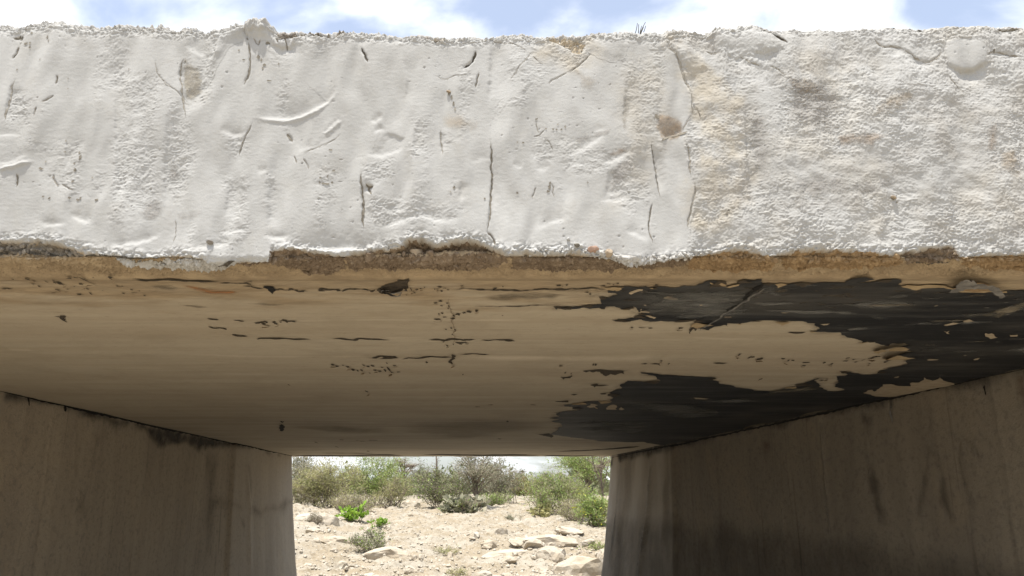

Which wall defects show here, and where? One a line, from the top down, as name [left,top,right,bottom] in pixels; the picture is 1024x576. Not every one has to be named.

crack [360,175,373,226]
crack [487,146,495,244]
crack [208,319,311,340]
crack [337,287,604,363]
peeling [231,240,1024,445]
crack [700,285,764,330]